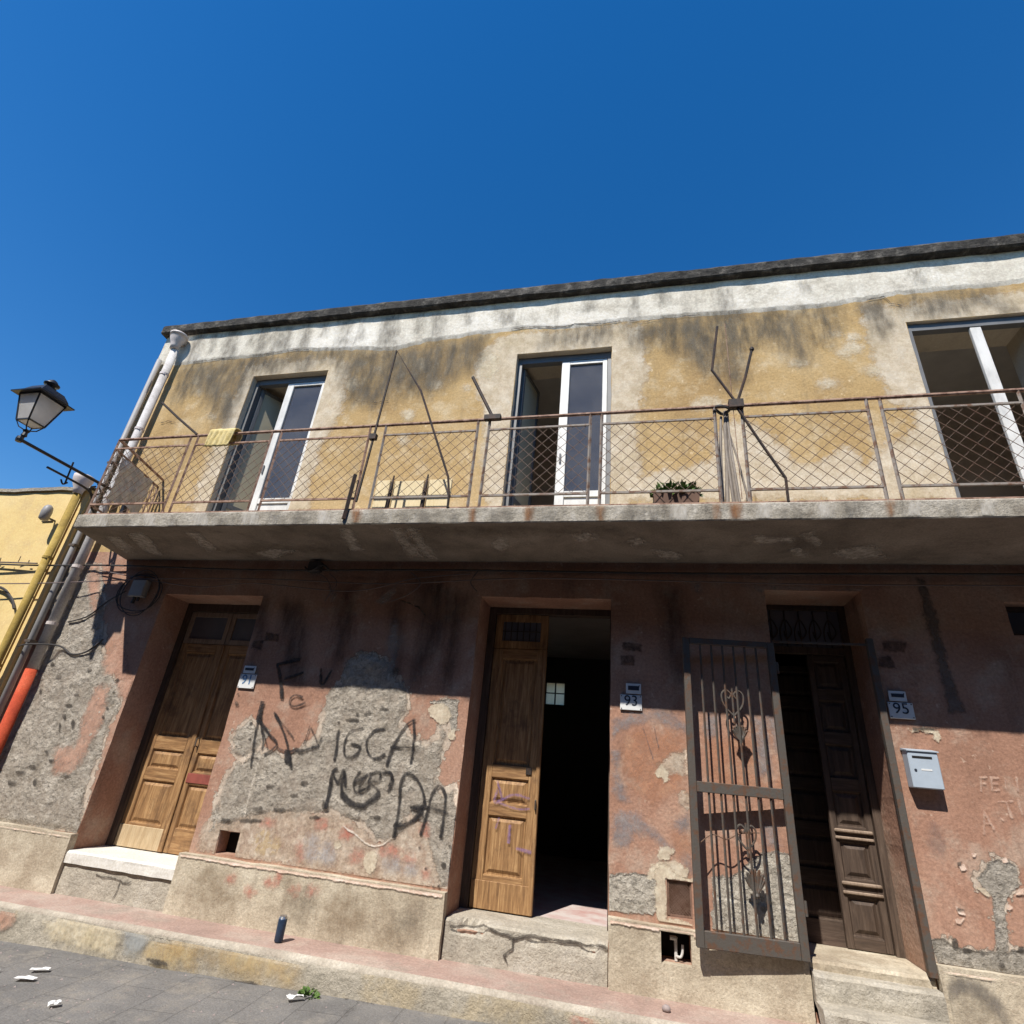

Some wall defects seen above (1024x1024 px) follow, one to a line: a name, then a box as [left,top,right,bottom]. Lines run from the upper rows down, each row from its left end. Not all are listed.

water stain [177,328,333,421]
water stain [346,317,483,402]
water stain [638,302,741,379]
flaking render [0,562,132,833]
flaking render [197,651,460,889]
peeling [623,731,690,809]
crack [450,924,607,963]
flaking render [609,838,693,926]
flaking render [932,851,1024,976]